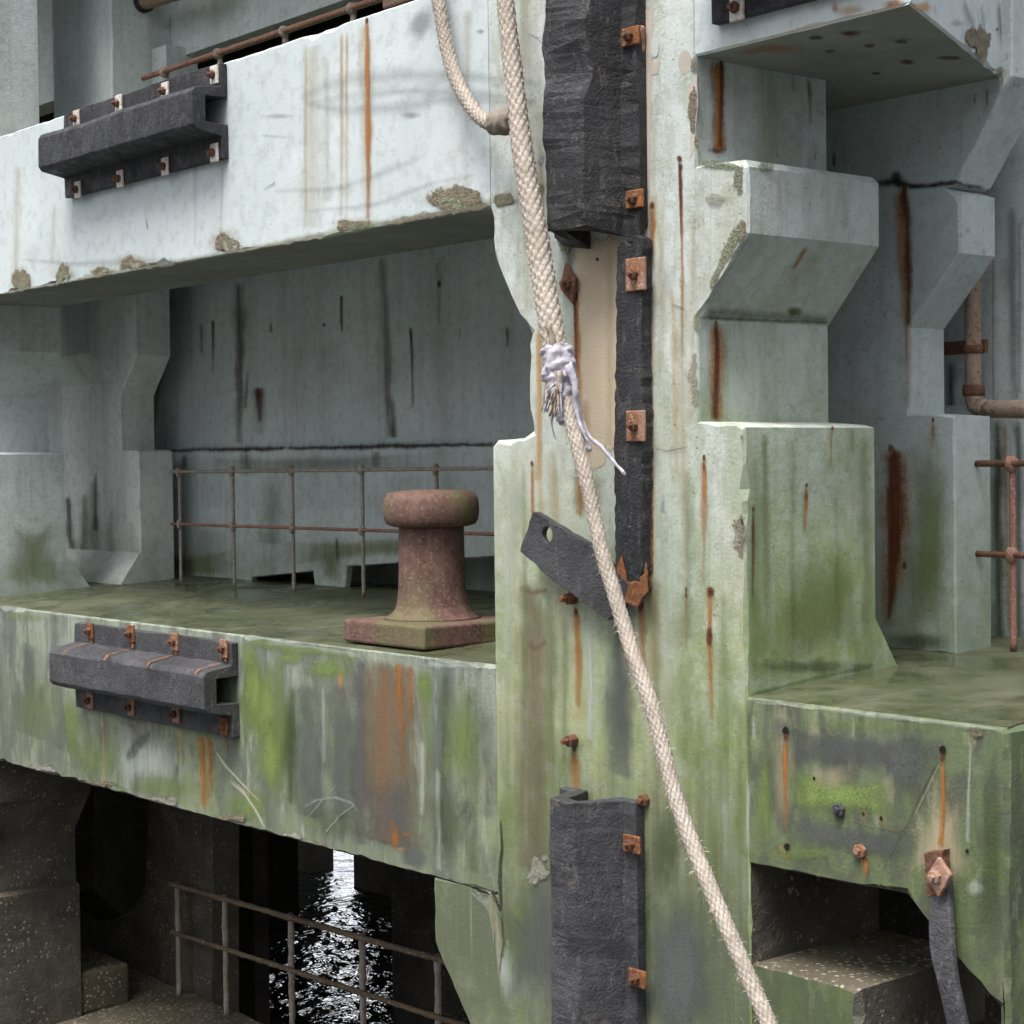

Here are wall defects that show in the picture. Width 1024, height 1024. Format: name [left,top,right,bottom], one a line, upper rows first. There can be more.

corrosion [711,61,725,153]
spalling [966,24,1003,85]
spalling [3,184,514,294]
corrosion [898,187,911,333]
leakage [235,287,244,418]
corrosion [712,321,724,419]
corrosion [884,445,908,617]
leakage [231,782,265,828]
leakage [258,711,320,816]
crack [450,821,504,957]